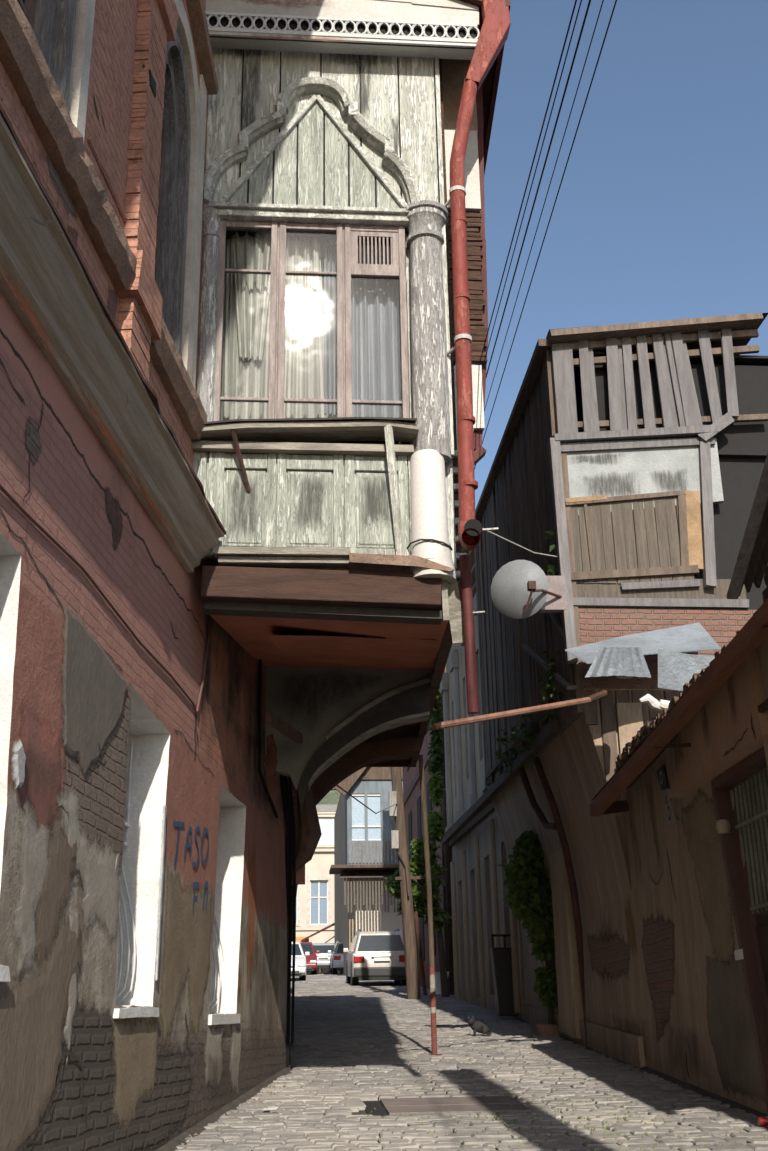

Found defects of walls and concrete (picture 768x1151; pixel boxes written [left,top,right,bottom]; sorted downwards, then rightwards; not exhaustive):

spalling [24,417,41,464]
crack [0,329,205,641]
spalling [105,487,123,550]
leakage [233,480,256,533]
leakage [299,482,323,520]
leakage [365,481,385,520]
leakage [580,454,634,494]
leakage [655,472,683,489]
crack [174,707,214,776]
flaking render [0,692,131,1151]